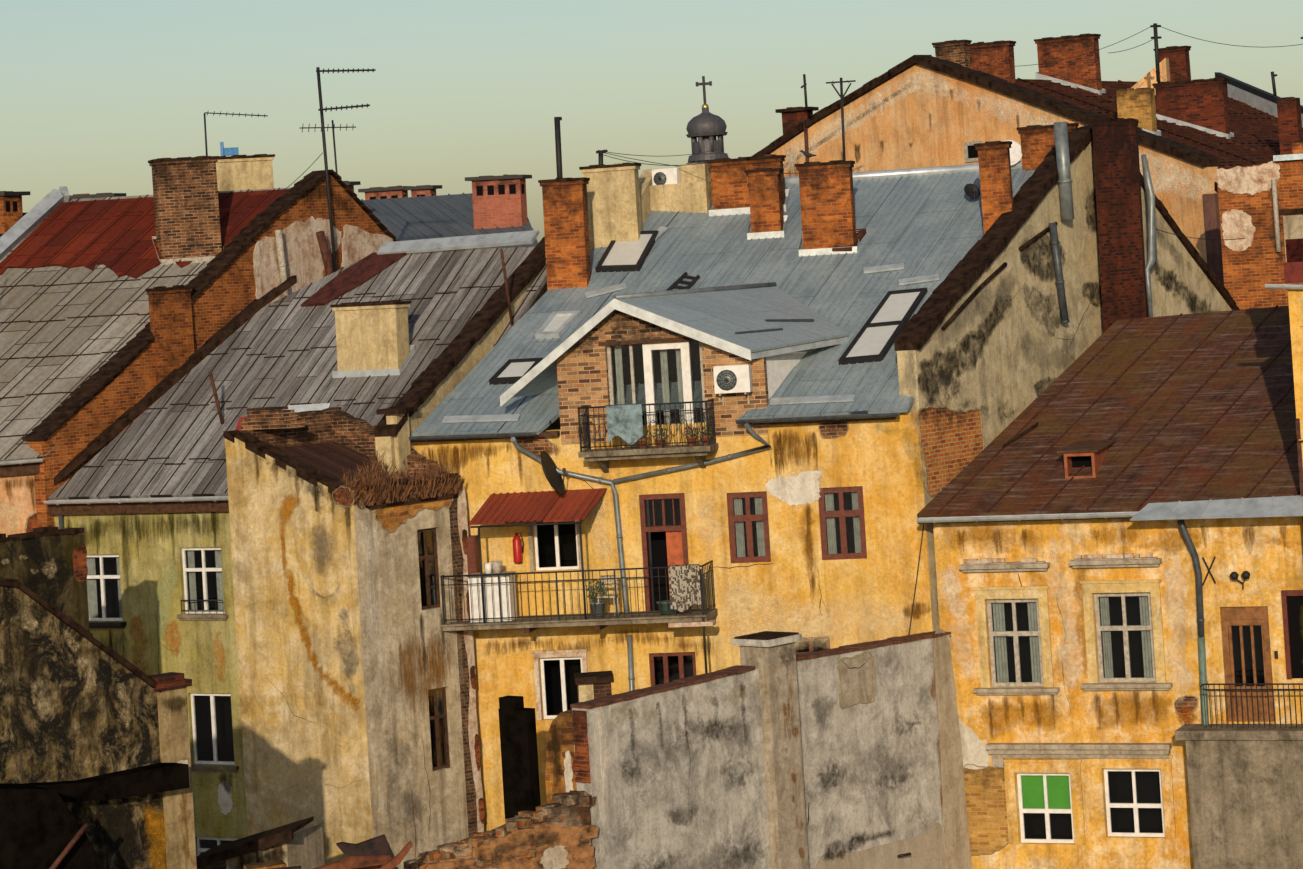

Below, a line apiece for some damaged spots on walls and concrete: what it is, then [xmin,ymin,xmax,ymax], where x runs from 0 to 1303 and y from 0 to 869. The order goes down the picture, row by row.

flaking render [253,216,394,306]
water stain [918,284,1009,406]
water stain [1021,236,1072,359]
water stain [1083,283,1102,306]
water stain [314,486,350,527]
flaking render [917,405,985,498]
water stain [18,620,117,736]
water stain [281,496,359,707]
spalling [332,473,485,832]
water stain [825,832,891,859]